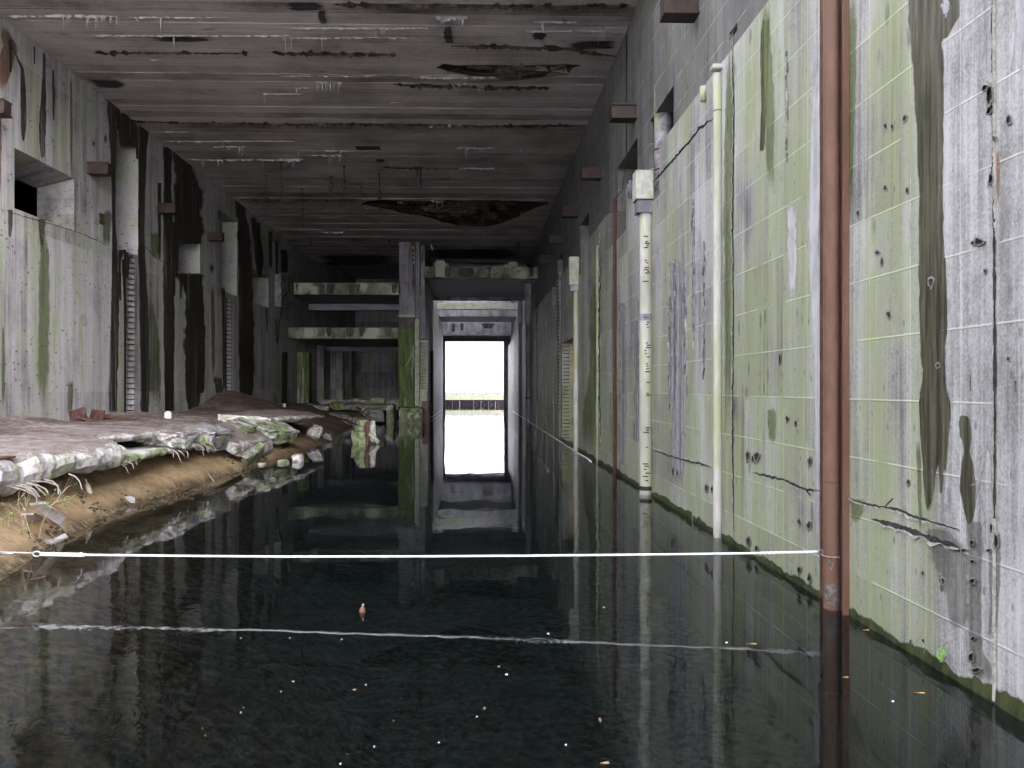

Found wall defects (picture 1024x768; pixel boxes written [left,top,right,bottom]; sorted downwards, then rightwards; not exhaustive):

spalling [393,43,616,91]
damp [87,79,376,412]
spalling [362,199,548,227]
peeling [667,199,706,481]
crack [652,31,820,539]
damp [908,0,976,524]
crack [848,497,968,552]